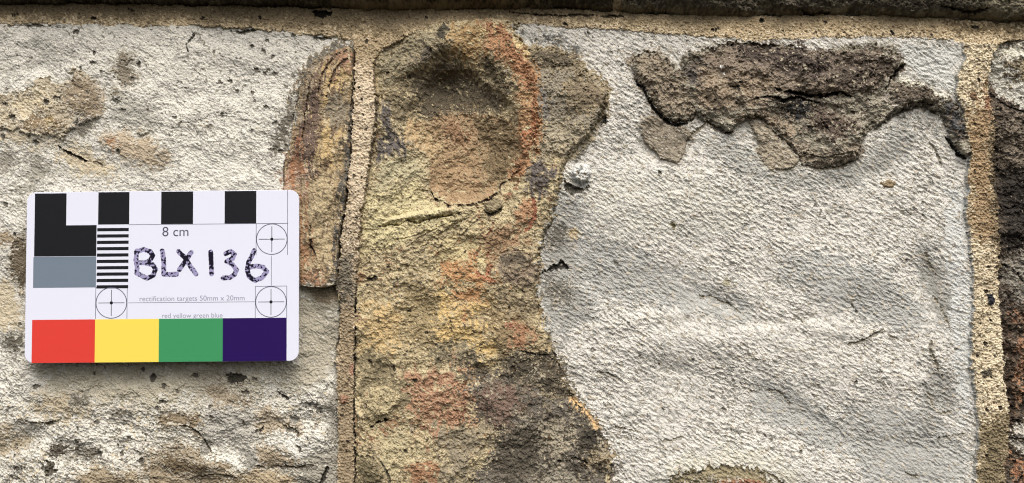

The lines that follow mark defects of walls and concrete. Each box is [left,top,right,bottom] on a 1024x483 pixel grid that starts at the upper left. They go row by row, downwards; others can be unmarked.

crack [59,146,108,169]
spalling [515,13,1002,483]
crack [847,303,899,346]
peeling [363,385,398,425]